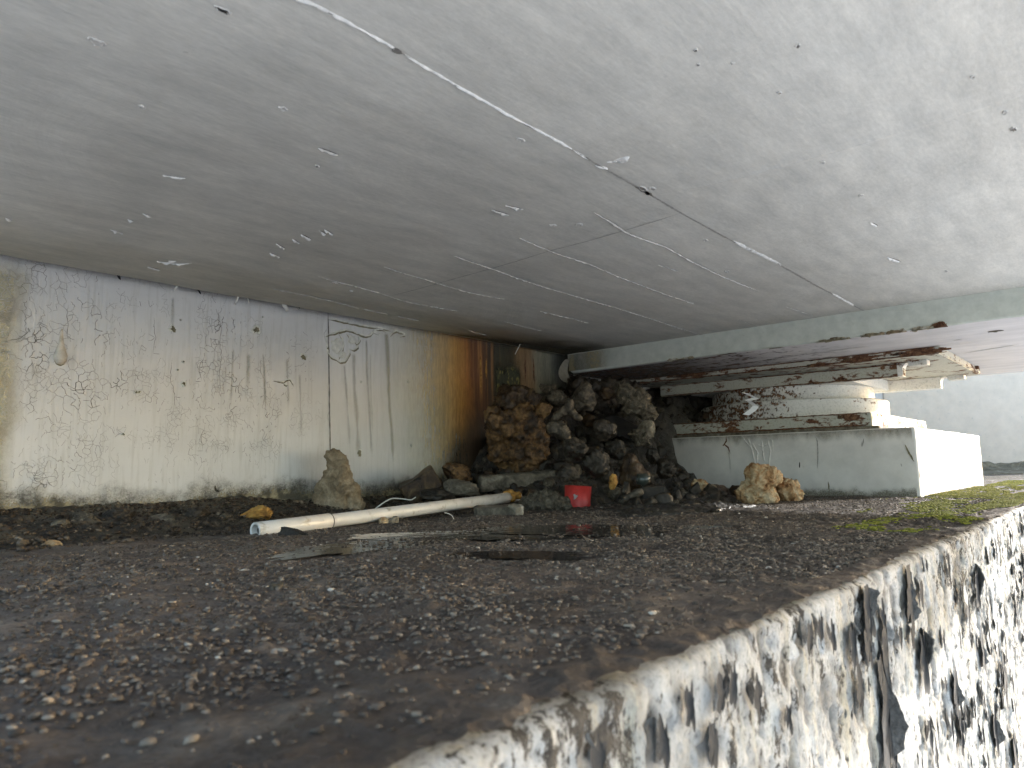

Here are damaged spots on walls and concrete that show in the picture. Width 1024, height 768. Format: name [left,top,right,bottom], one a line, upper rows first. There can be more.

corrosion [417,331,951,479]